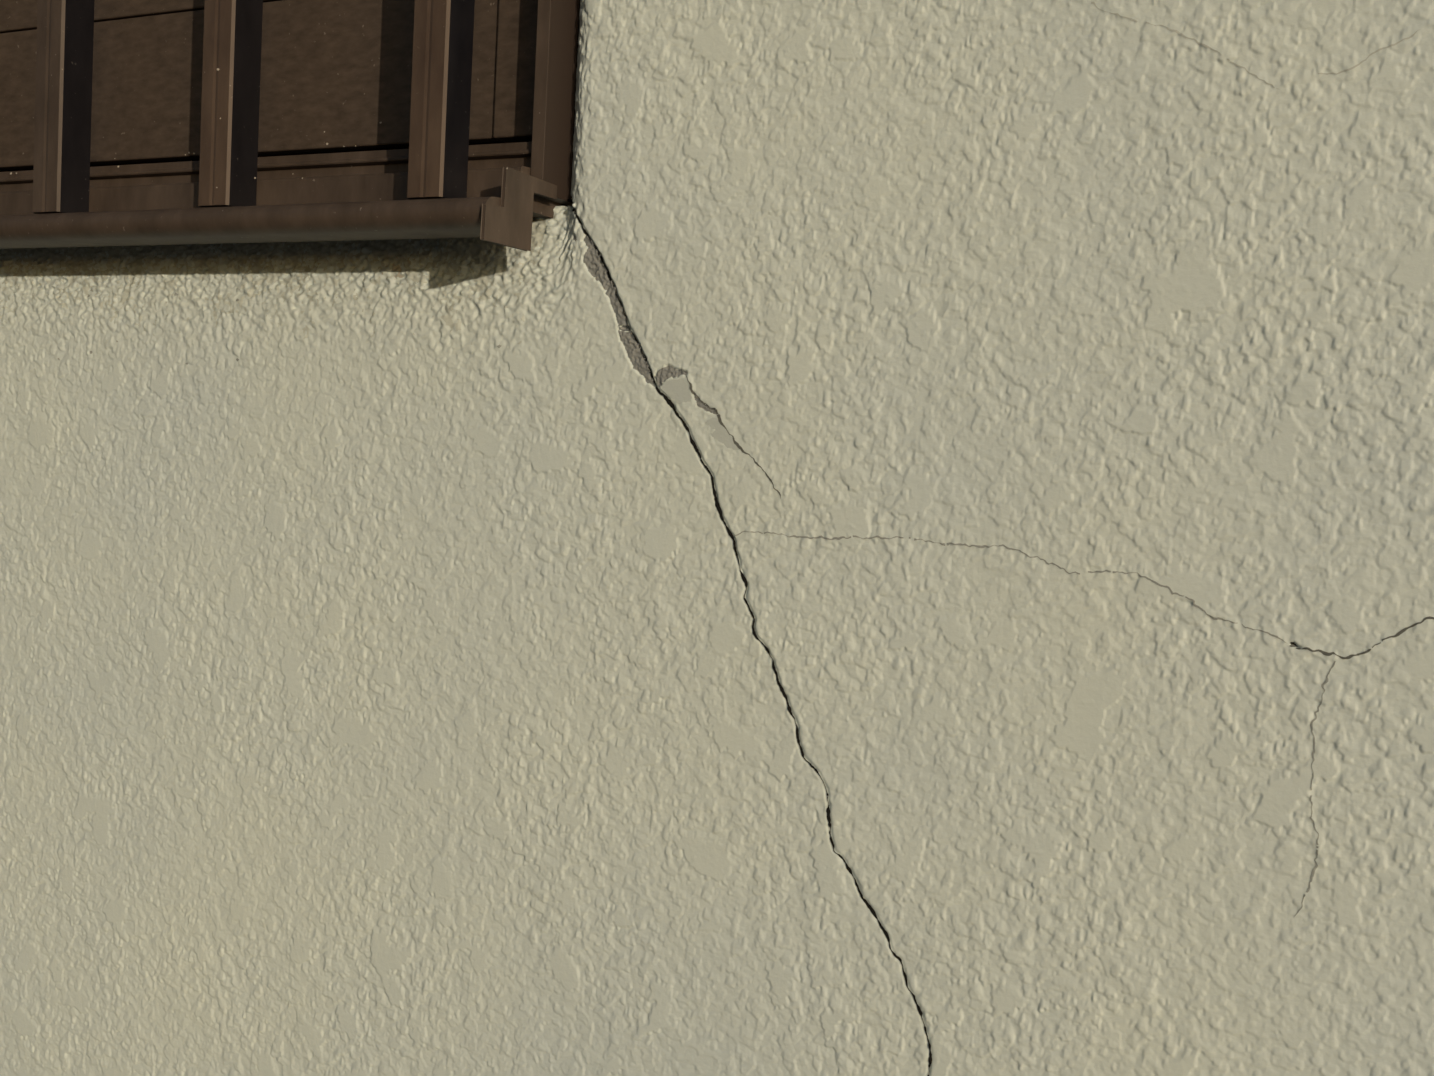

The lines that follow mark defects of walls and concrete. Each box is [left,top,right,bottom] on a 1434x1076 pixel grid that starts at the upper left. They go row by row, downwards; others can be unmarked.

spalling [573,235,739,450]
crack [571,196,1434,1076]